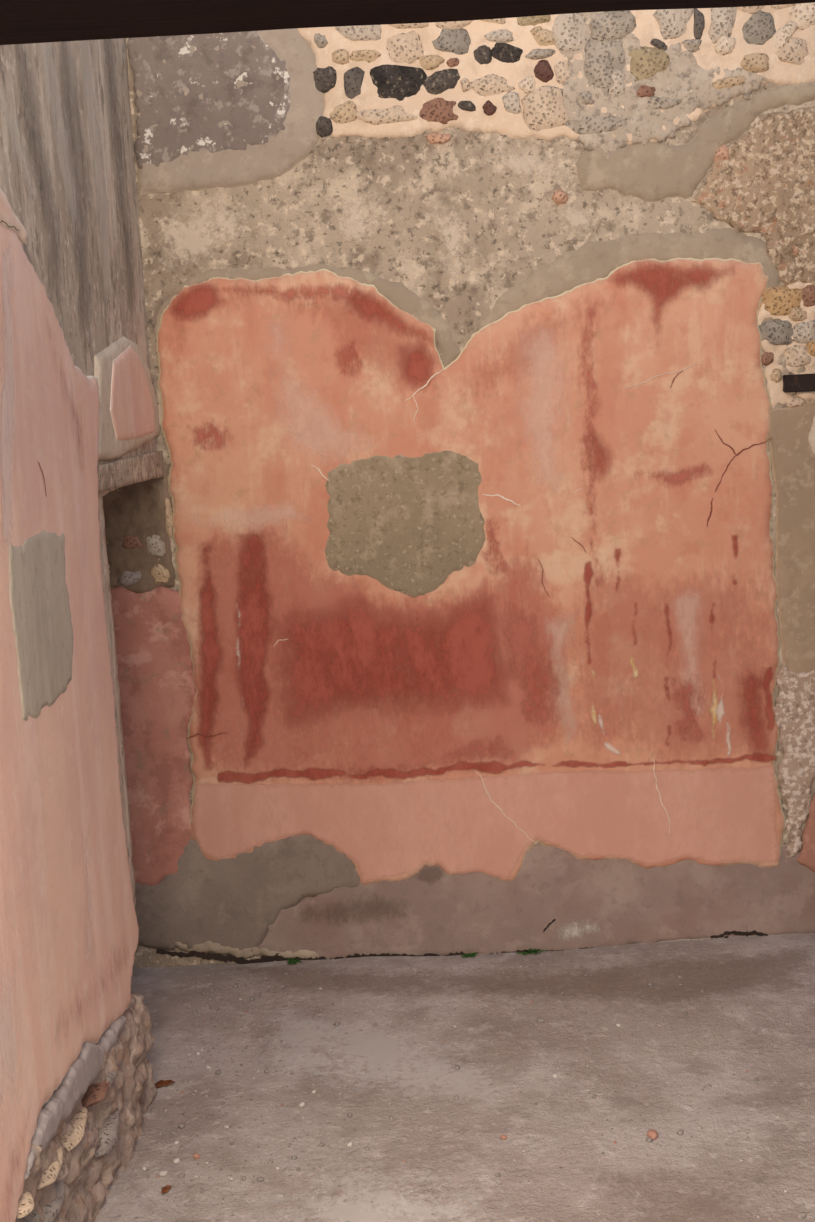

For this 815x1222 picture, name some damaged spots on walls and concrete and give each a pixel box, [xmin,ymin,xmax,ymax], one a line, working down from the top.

flaking render [297,2,815,145]
flaking render [552,189,568,205]
flaking render [758,282,815,407]
crack [707,430,772,526]
flaking render [135,664,815,959]
flaking render [15,992,157,1222]